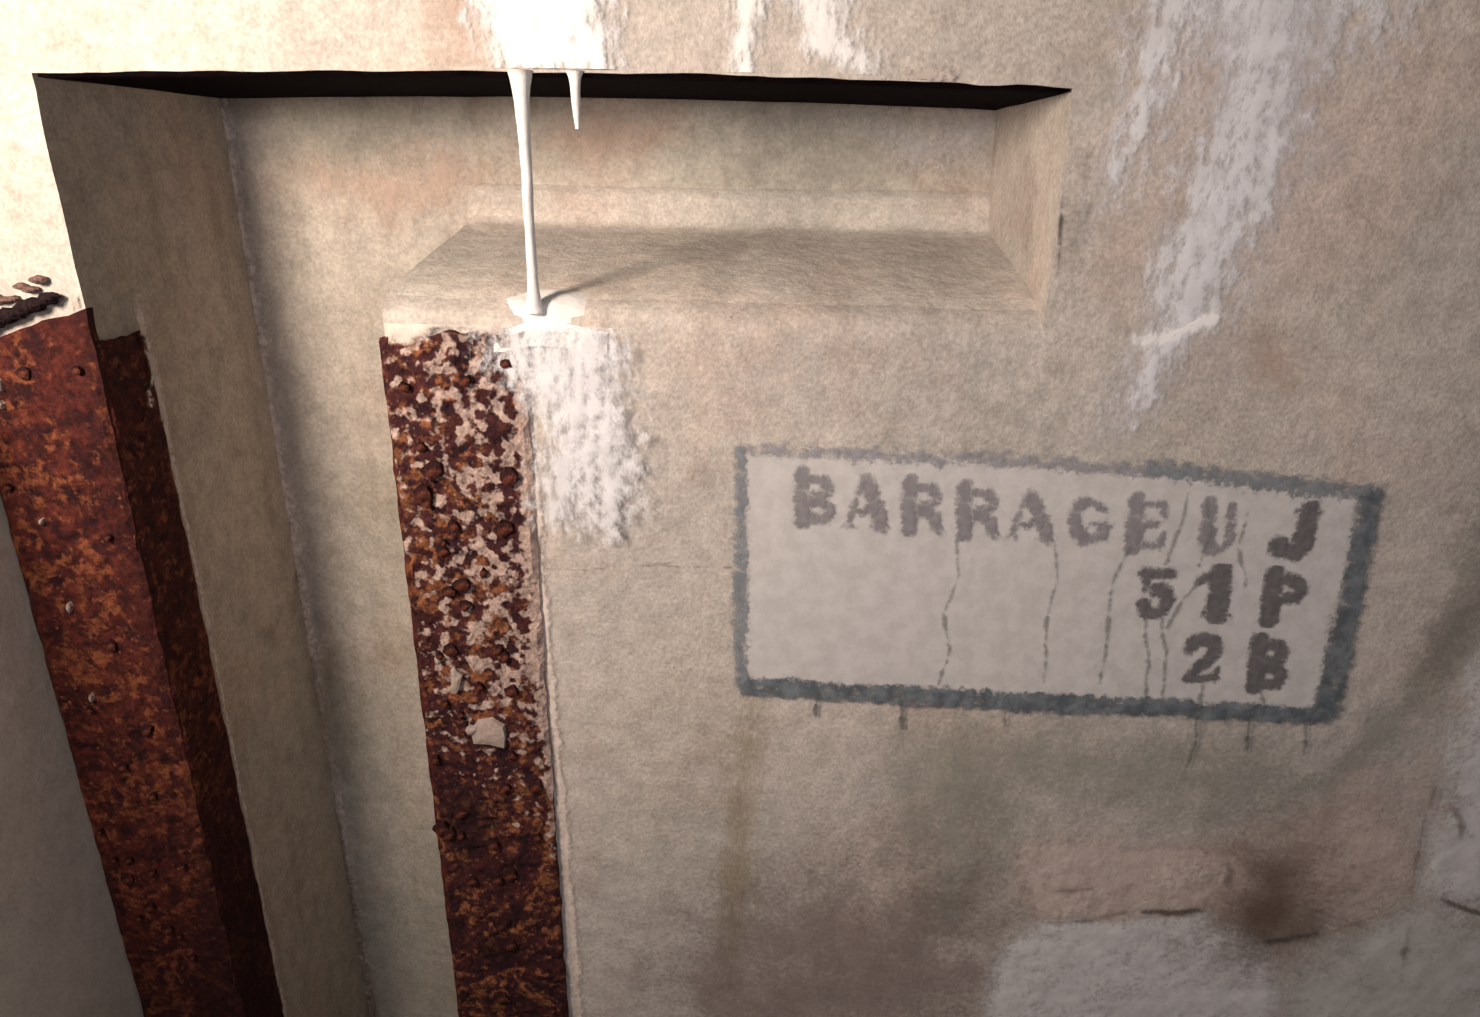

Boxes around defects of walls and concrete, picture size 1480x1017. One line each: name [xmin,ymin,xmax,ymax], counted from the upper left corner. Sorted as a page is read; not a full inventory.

damp [459,0,627,69]
efflorescence [727,0,880,75]
efflorescence [1099,0,1423,431]
rust [398,381,411,392]
efflorescence [483,289,649,544]
rust [413,441,443,509]
rust [500,467,519,488]
rust [437,519,461,557]
rust [441,566,489,612]
rust [436,643,459,660]
rust [504,684,519,698]
rust [432,805,469,840]